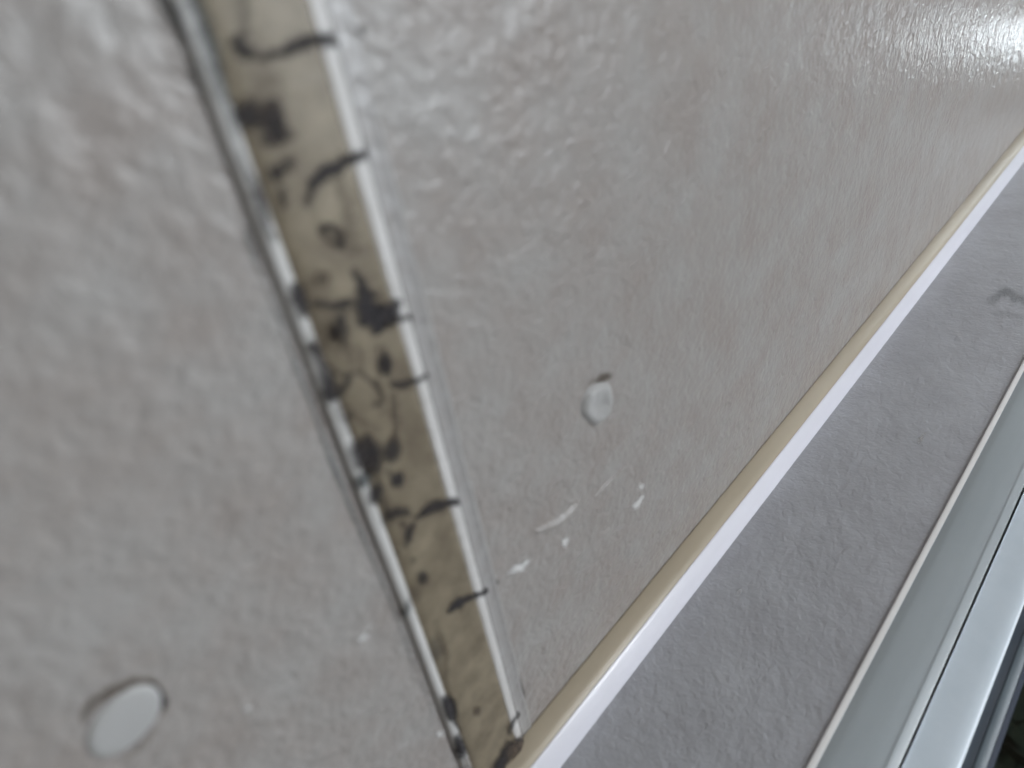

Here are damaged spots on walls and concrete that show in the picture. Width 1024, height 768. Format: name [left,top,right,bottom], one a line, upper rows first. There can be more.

leakage [232,33,340,61]
leakage [306,149,369,204]
leakage [313,269,422,344]
leakage [310,341,460,546]
leakage [447,581,498,613]
leakage [494,712,524,768]